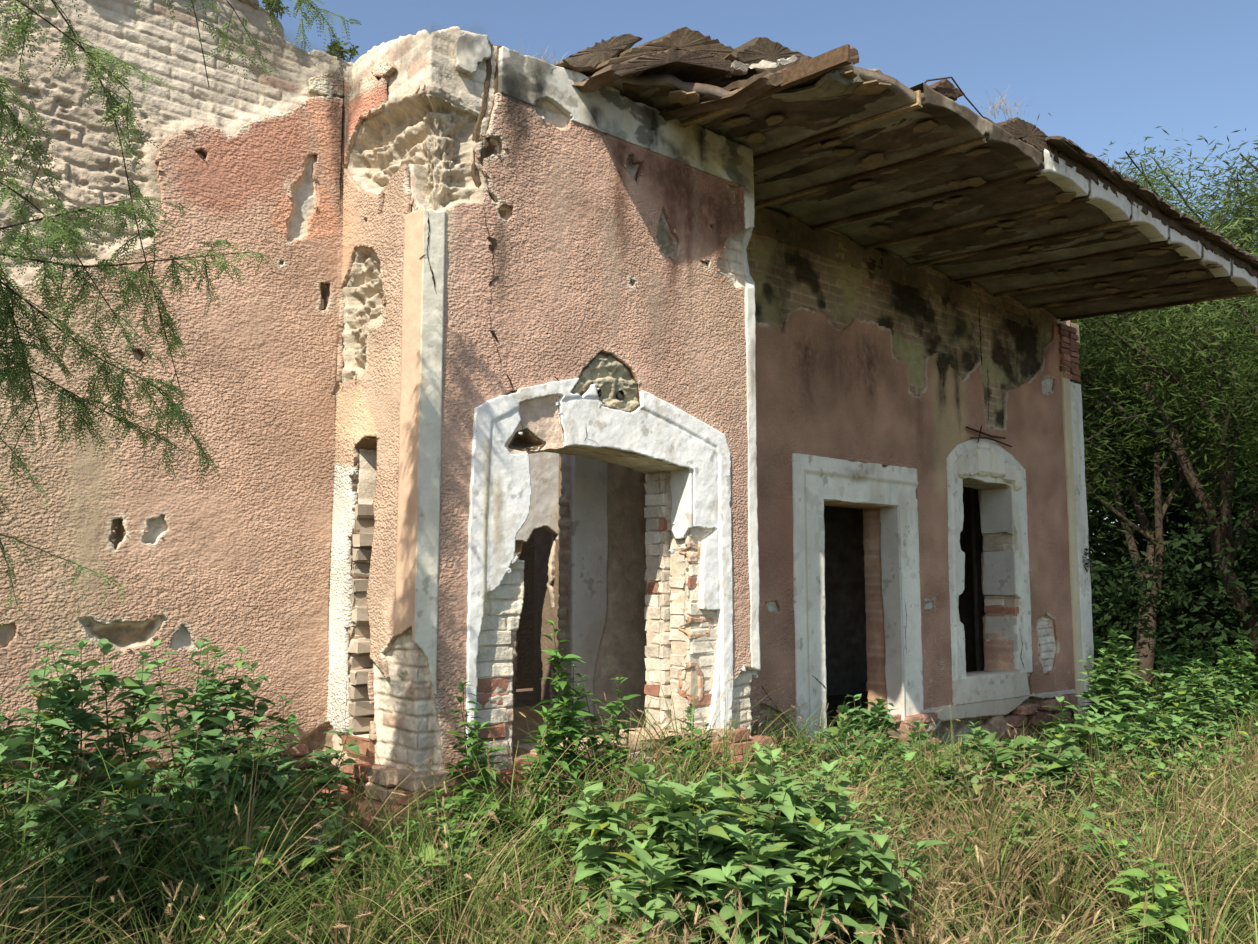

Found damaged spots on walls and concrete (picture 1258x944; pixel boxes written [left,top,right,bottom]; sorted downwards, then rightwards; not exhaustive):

flaking render [0,0,354,290]
spalling [347,84,514,221]
water stain [506,67,543,151]
crack [471,41,513,393]
flaking render [700,68,1053,429]
flaking render [320,244,386,390]
flaking render [505,351,641,454]
crack [553,376,597,443]
flaking render [109,518,126,549]
flaking render [142,515,167,544]
flaking render [80,611,197,652]
flaking render [1037,615,1057,673]